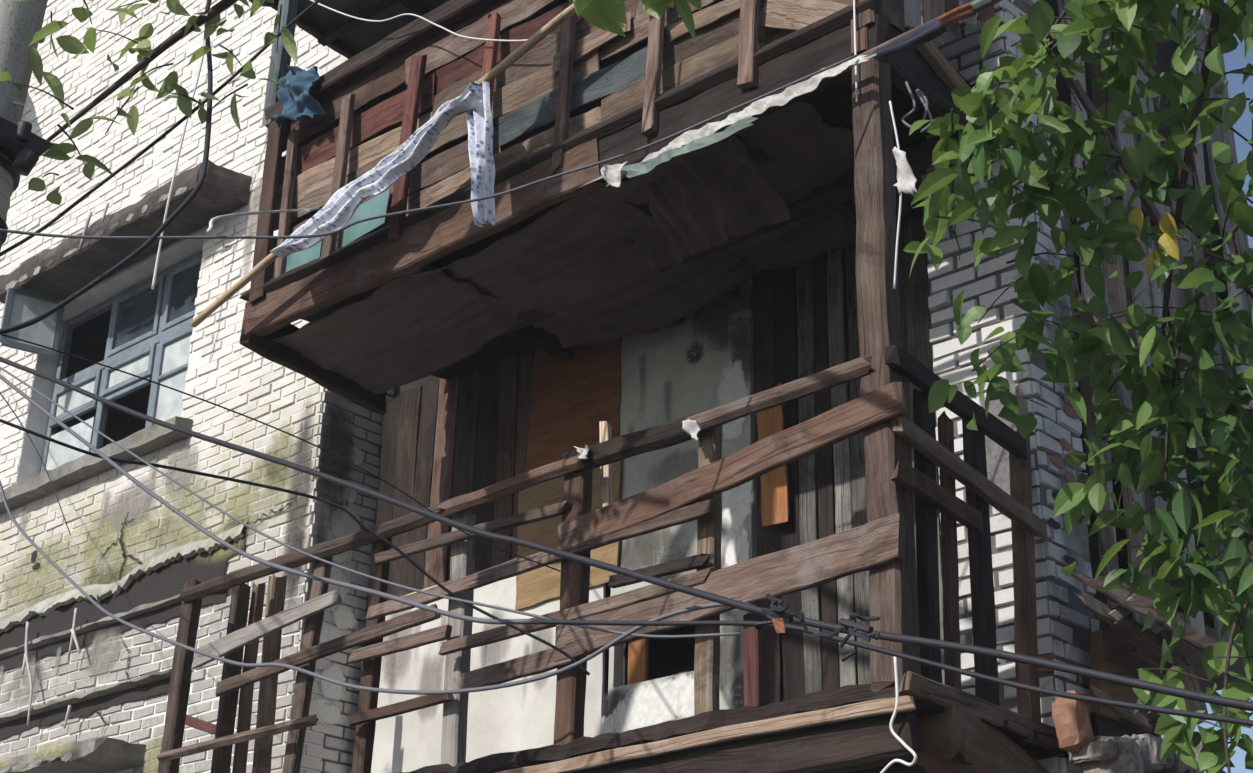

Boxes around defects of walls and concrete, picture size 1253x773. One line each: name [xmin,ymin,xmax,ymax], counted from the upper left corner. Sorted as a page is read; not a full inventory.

mould [671,285,753,382]
leakage [101,448,193,525]
leakage [654,452,698,483]
crack [100,512,142,591]
leakage [619,529,697,580]